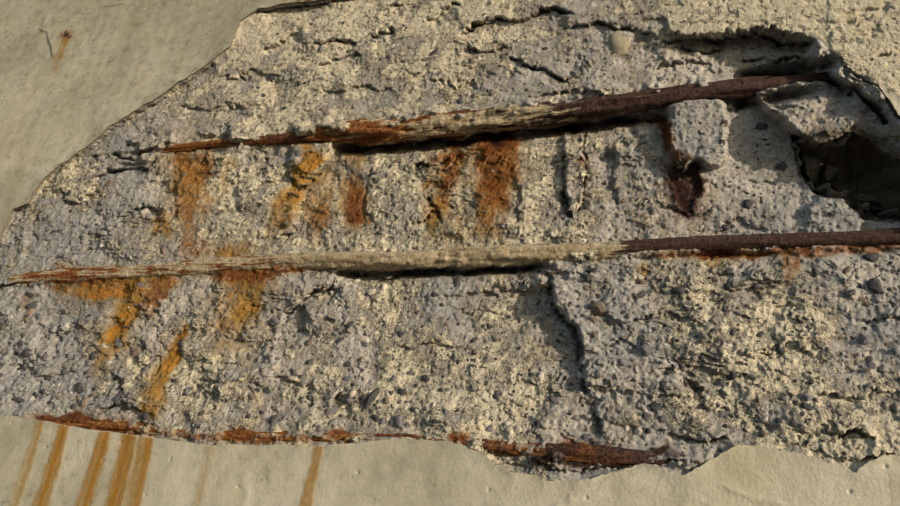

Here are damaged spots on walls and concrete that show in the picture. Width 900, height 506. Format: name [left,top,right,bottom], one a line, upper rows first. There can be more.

spalling [137,40,233,111]
spalling [233,2,298,39]
flaking render [662,0,900,96]
spalling [0,110,136,240]
corrosion [272,144,367,236]
corrosion [424,131,520,231]
corrosion [649,115,708,219]
spalling [821,163,839,182]
spalling [857,194,884,208]
corrosion [649,244,893,275]
corrosion [51,275,176,363]
corrosion [19,410,153,506]